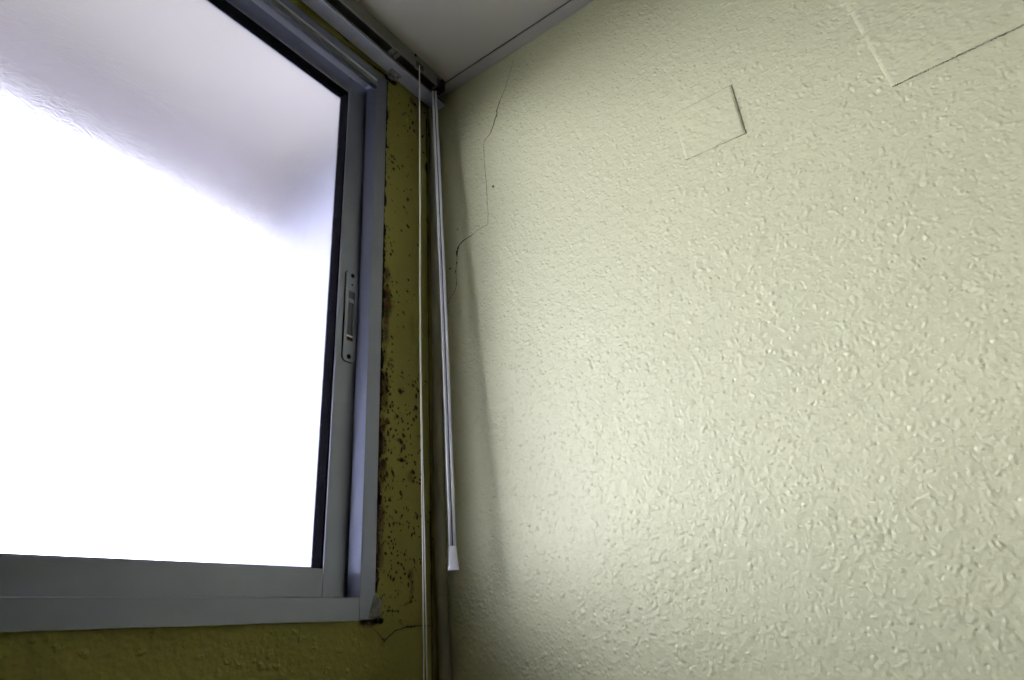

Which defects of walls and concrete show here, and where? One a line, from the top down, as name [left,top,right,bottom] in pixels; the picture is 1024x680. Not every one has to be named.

water stain [378,317,433,625]